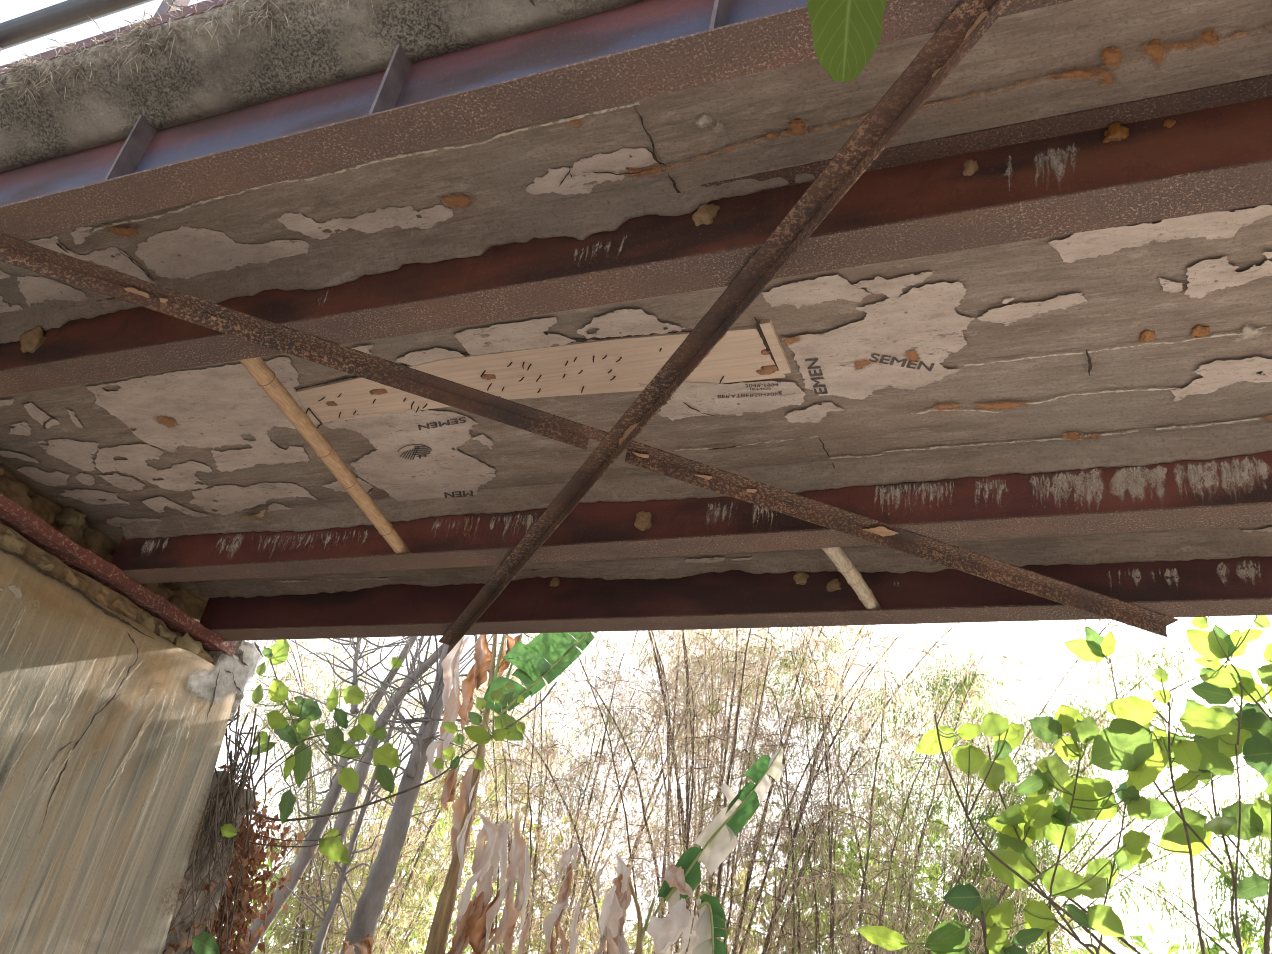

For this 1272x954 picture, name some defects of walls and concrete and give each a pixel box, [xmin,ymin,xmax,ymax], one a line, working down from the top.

crack [559,107,681,193]
efflorescence [1035,143,1076,180]
peeling [28,205,453,285]
peeling [1049,205,1272,263]
peeling [1159,252,1272,299]
peeling [658,271,1087,423]
peeling [0,357,496,528]
efflorescence [875,483,952,507]
efflorescence [1029,456,1269,504]
leakage [1109,568,1178,584]
efflorescence [1217,560,1261,582]
crack [0,547,154,834]